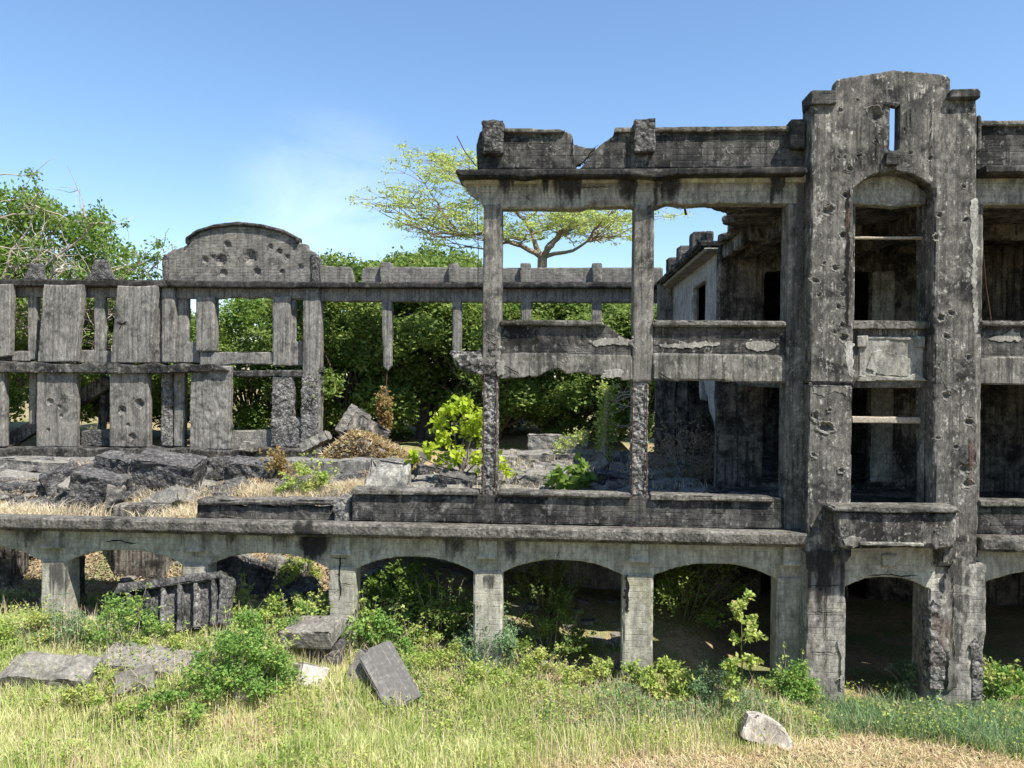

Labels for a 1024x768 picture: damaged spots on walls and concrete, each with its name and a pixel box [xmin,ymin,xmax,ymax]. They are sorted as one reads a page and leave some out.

crack [570,137,605,193]
peeling [559,335,645,363]
peeling [658,338,720,354]
peeling [745,339,779,352]
peeling [808,302,919,438]
damp [806,549,845,621]
peeling [941,556,973,691]